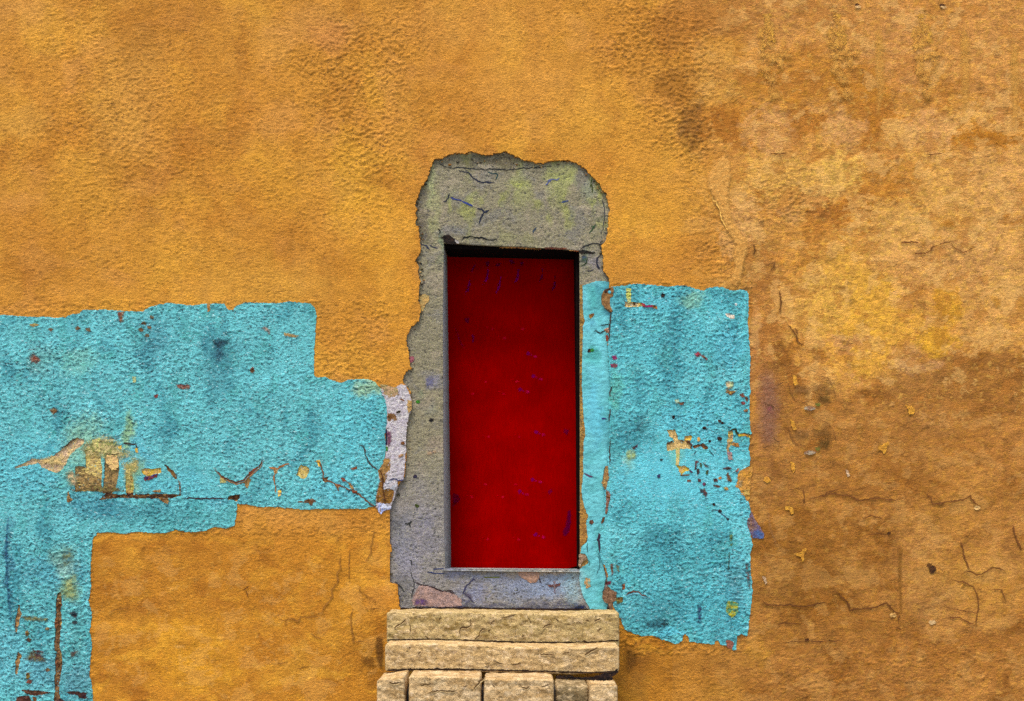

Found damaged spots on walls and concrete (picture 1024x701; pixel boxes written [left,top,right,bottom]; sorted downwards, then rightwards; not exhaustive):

spalling [416,152,606,314]
crack [900,241,974,254]
peeling [15,434,181,504]
crack [184,459,289,500]
crack [314,445,404,507]
flaking render [376,341,420,514]
peeling [578,466,611,588]
peeling [660,402,753,501]
crack [790,488,980,535]
peeling [15,592,88,701]
crack [764,592,902,643]
crack [946,543,1006,624]